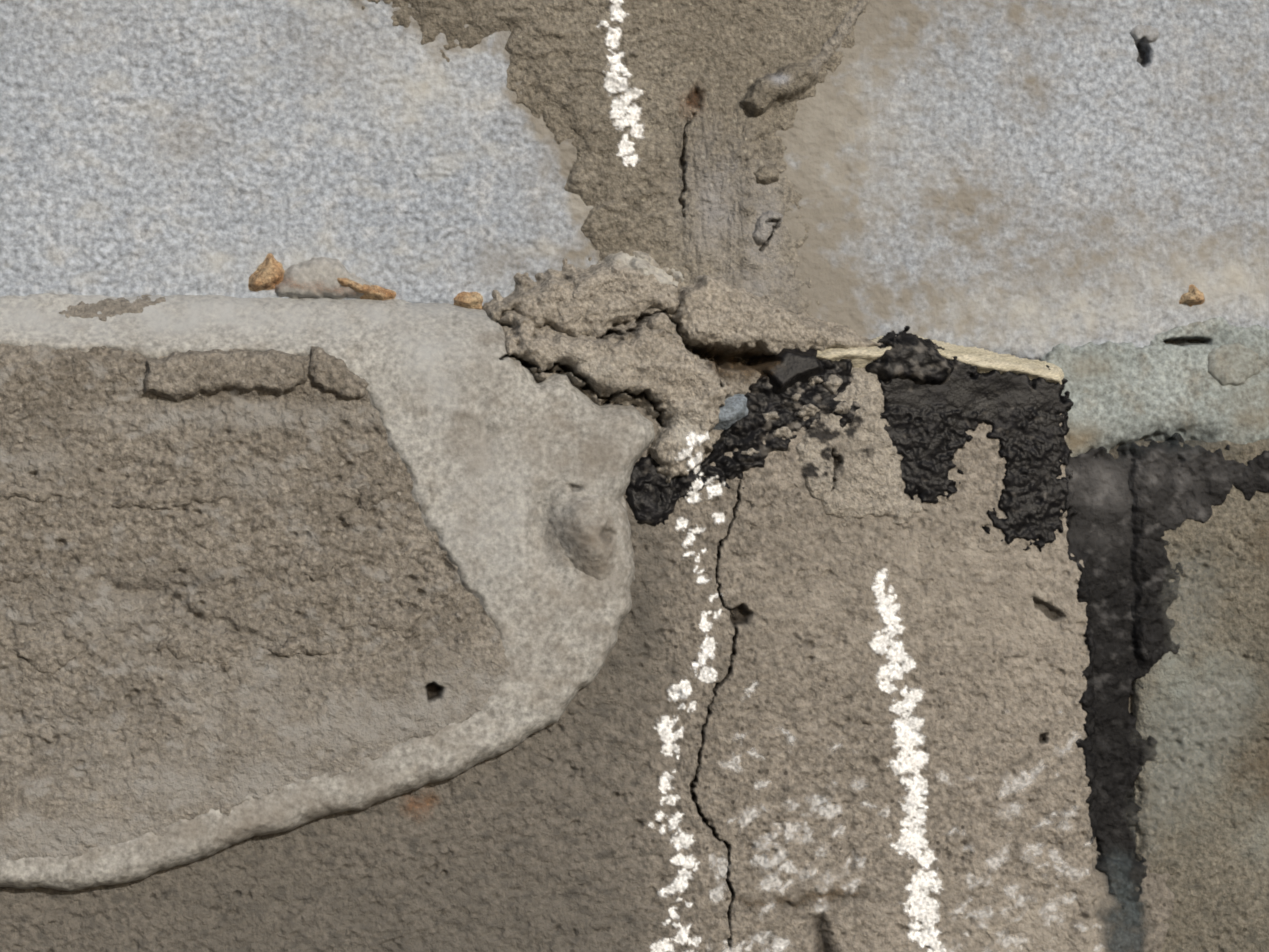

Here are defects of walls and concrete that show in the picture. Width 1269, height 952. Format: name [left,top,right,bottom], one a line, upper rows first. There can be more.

damp [704,350,773,378]
spalling [0,343,512,861]
crack [689,485,740,950]
damp [1103,853,1144,952]